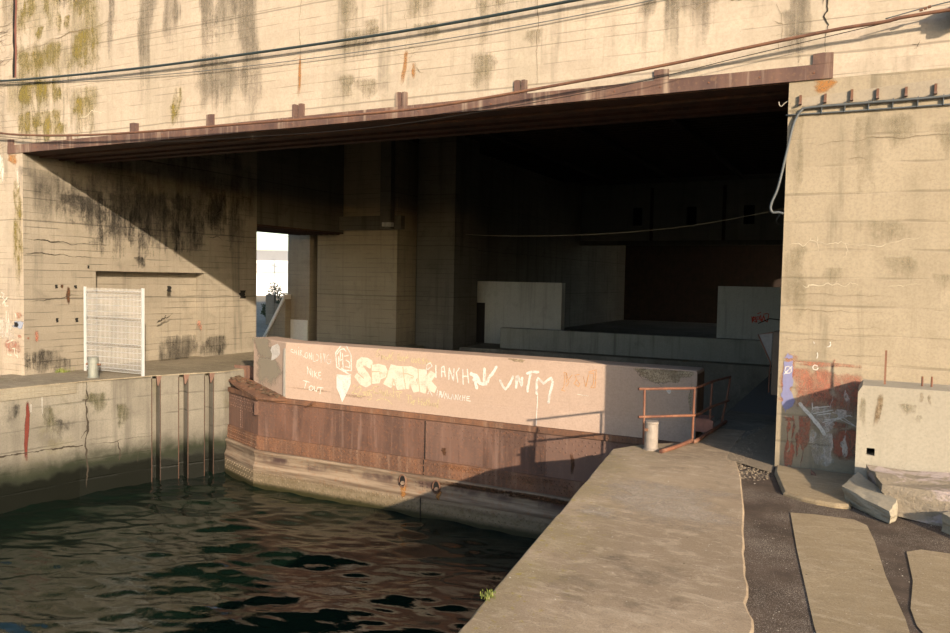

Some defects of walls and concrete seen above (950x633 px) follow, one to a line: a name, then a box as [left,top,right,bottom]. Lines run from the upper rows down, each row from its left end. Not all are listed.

damp [17,0,98,65]
damp [139,0,153,56]
damp [201,0,255,62]
damp [644,0,709,22]
damp [18,27,64,141]
damp [73,91,95,129]
damp [200,55,235,96]
damp [35,172,252,266]
crack [0,382,152,487]
peeling [781,353,861,467]
rust [436,482,569,505]